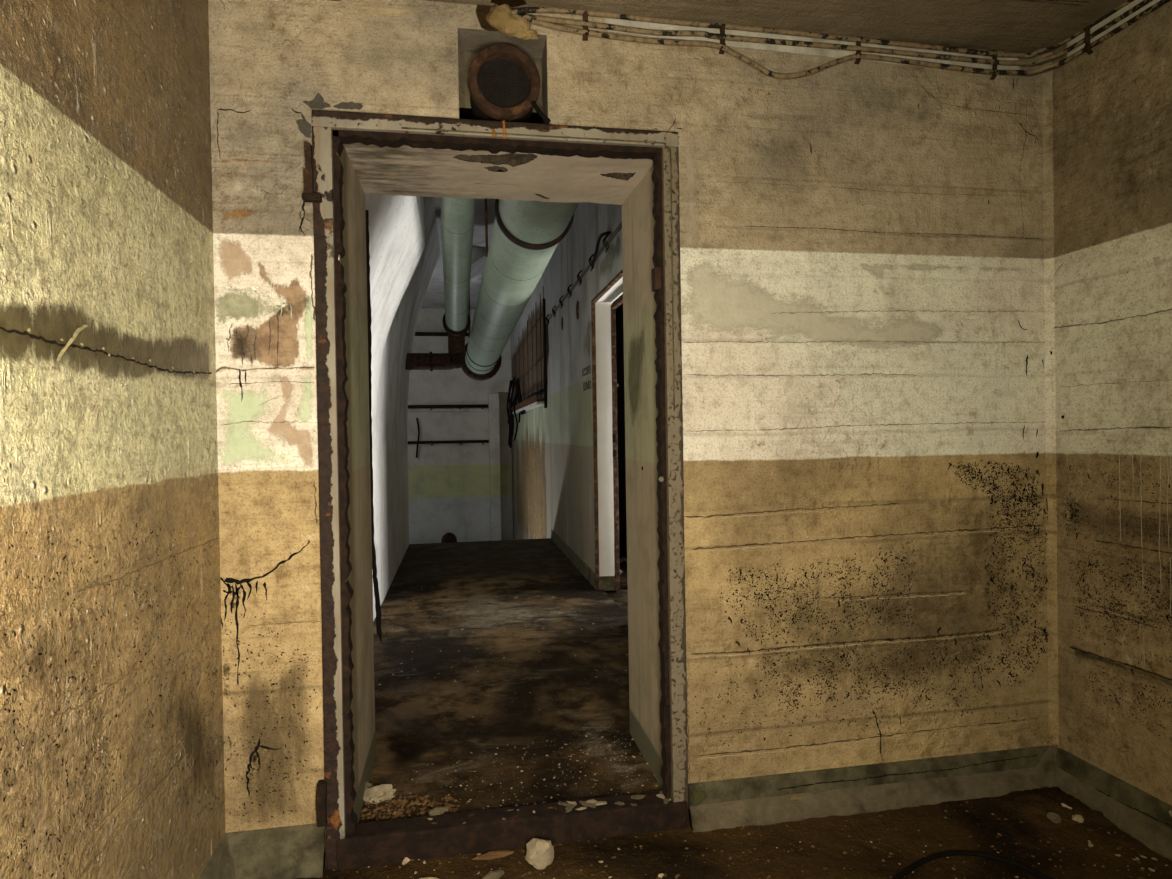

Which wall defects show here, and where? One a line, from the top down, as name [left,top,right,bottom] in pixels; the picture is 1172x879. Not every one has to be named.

leakage [0,279,292,402]
crack [0,327,314,425]
peeling [220,240,315,465]
crack [220,541,320,684]
leakage [695,452,1048,746]
leakage [1065,454,1172,741]
crack [246,738,283,795]